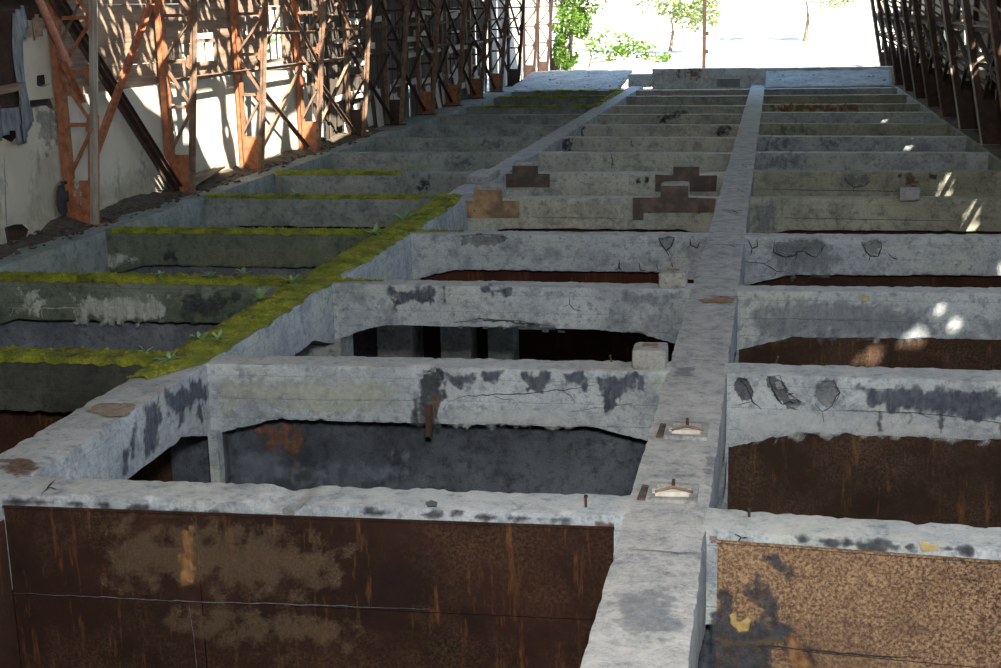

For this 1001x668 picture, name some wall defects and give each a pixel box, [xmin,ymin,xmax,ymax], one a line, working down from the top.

crack [615,217,949,275]
water stain [123,378,207,475]
water stain [412,371,503,429]
crack [443,385,638,413]
water stain [565,371,644,412]
spalling [734,377,753,401]
spalling [766,375,801,410]
spalling [813,378,841,408]
water stain [740,385,1001,436]
corrosion [181,527,194,583]
corrosion [764,554,792,581]
corrosion [708,573,814,668]